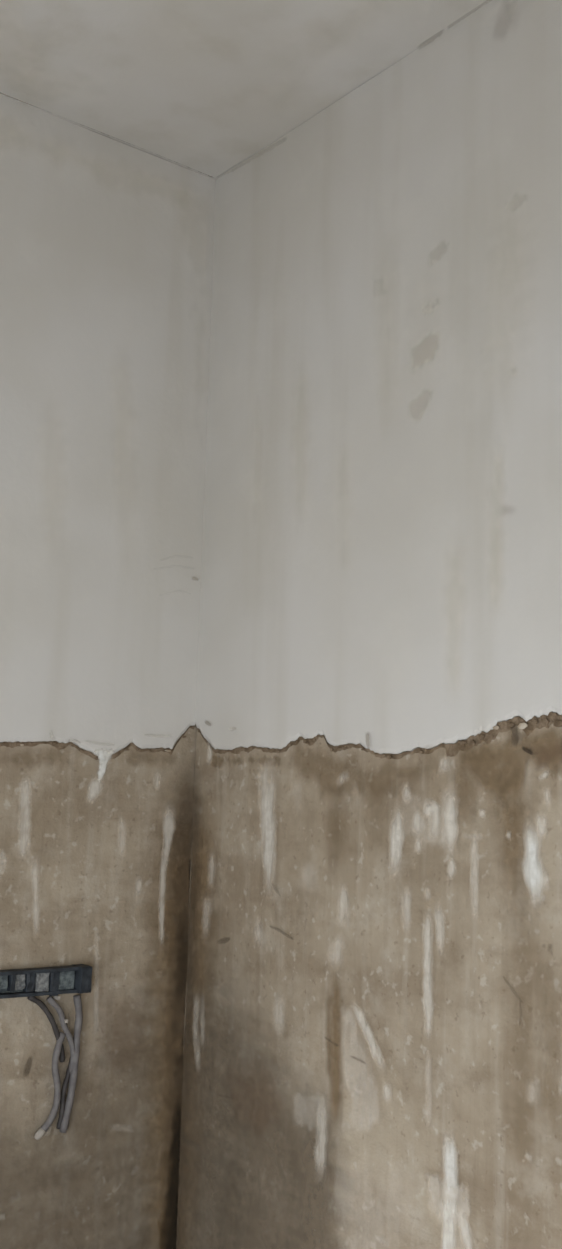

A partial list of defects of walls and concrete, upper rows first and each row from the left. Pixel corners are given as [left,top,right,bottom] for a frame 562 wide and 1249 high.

efflorescence [90,750,113,799]
damp [261,774,274,879]
efflorescence [391,799,456,865]
damp [154,816,334,1249]
spalling [0,712,562,1249]
damp [357,1011,380,1059]
efflorescence [424,915,442,1029]
efflorescence [443,1146,470,1249]